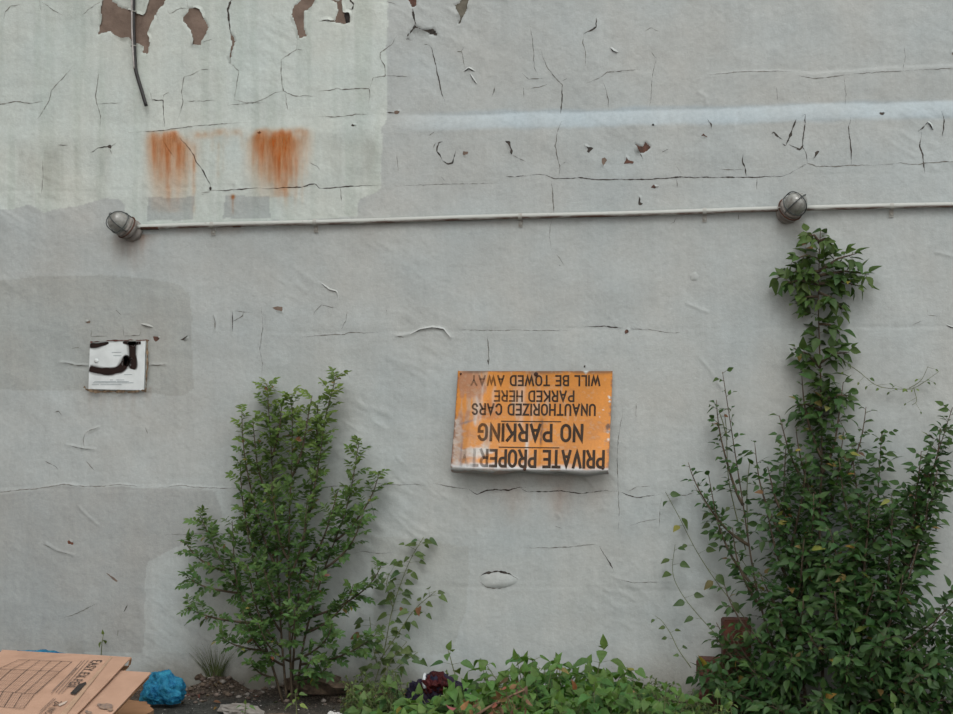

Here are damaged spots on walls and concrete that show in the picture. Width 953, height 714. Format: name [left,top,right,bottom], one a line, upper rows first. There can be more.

peeling [98,0,165,54]
peeling [183,5,209,48]
peeling [290,0,354,40]
peeling [406,25,437,40]
peeling [454,0,472,24]
crack [2,70,70,118]
crack [92,1,443,200]
crack [430,132,486,185]
peeling [624,142,650,164]
crack [508,19,953,263]
crack [369,403,692,531]